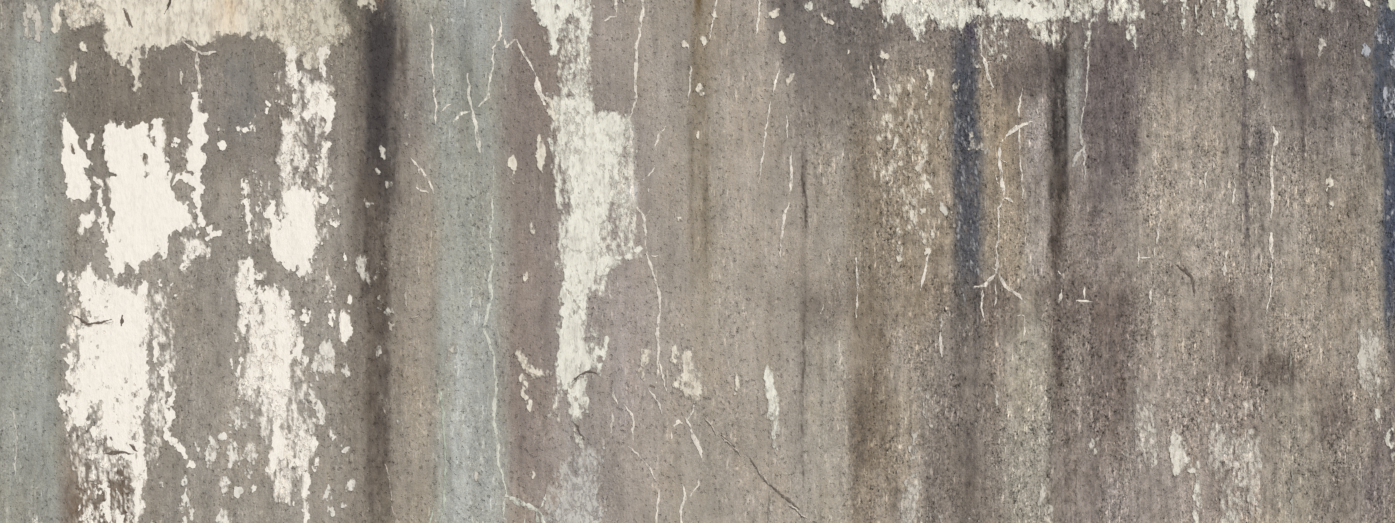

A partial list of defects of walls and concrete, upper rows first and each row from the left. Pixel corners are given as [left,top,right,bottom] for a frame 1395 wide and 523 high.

peeling [21,0,394,523]
damp [337,0,529,523]
crack [430,16,546,523]
peeling [507,155,517,184]
peeling [513,0,644,523]
peeling [765,8,786,43]
peeling [805,1,835,25]
damp [761,0,1205,523]
peeling [850,0,1145,309]
peeling [1161,0,1282,81]
damp [1208,0,1395,523]
peeling [1313,0,1335,15]